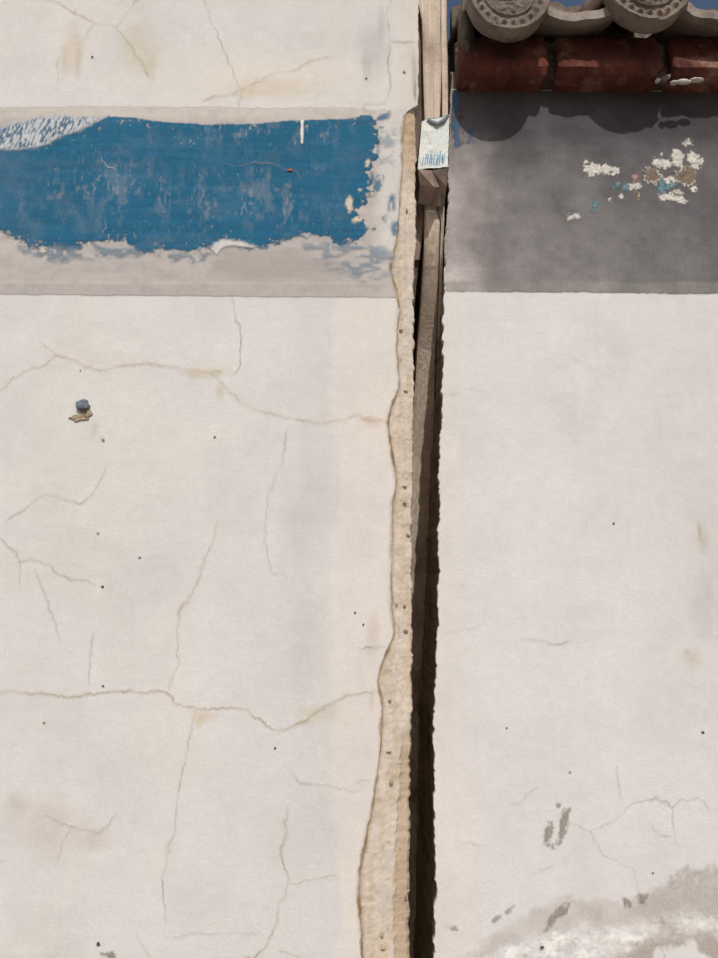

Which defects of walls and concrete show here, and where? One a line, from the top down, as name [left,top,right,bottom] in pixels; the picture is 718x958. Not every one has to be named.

peeling [567,138,704,220]
peeling [0,110,418,958]
leakage [630,868,718,958]